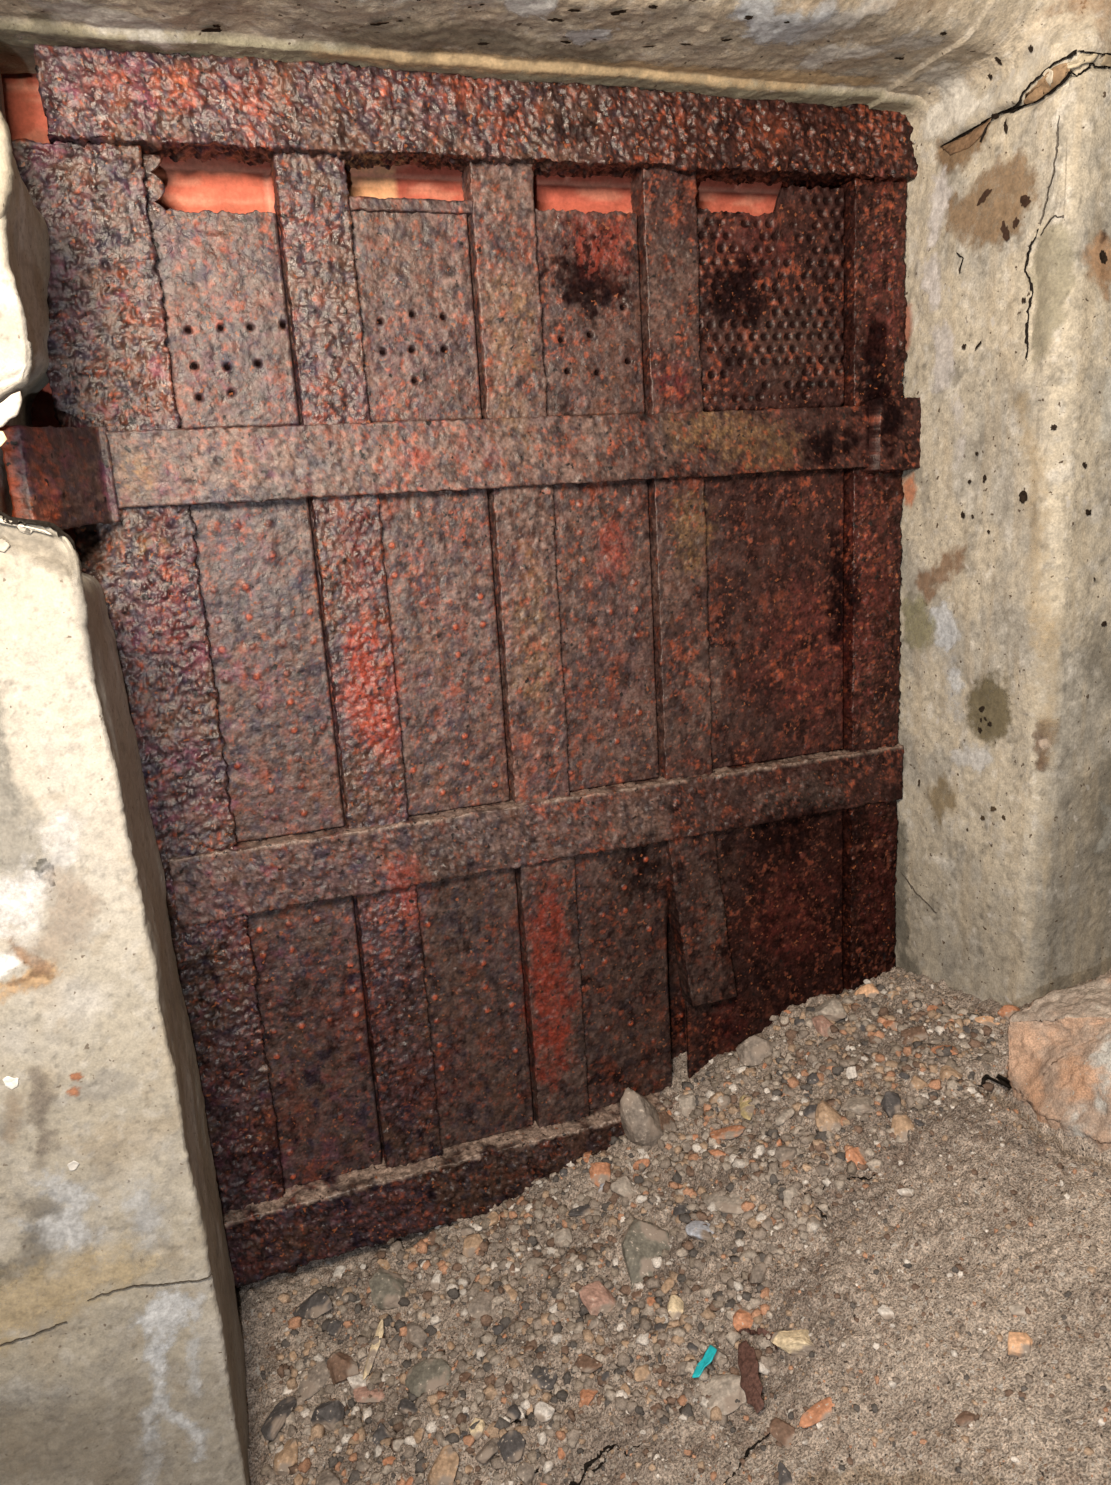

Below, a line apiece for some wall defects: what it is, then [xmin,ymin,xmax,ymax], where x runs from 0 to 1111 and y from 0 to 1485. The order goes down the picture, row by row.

corrosion [313,48,875,89]
crack [940,49,1111,362]
flaking render [0,378,28,447]
corrosion [903,478,915,504]
damp [902,598,961,651]
damp [949,668,1011,772]
damp [0,770,60,935]
damp [0,953,20,978]
corrosion [0,947,55,995]
corrosion [67,1073,82,1096]
crack [0,1274,212,1346]
damp [137,1291,205,1462]